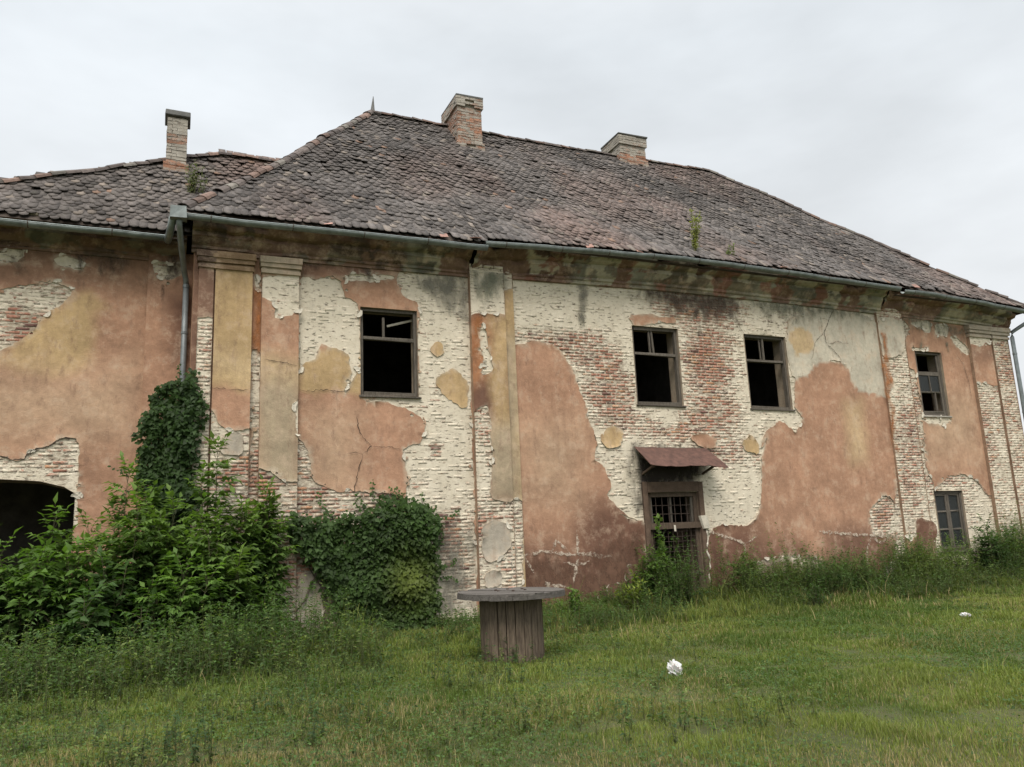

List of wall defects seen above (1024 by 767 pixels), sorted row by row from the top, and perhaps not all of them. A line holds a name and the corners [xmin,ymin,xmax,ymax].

spalling [0,253,86,351]
spalling [151,260,182,285]
leakage [417,272,506,316]
leakage [579,285,587,322]
leakage [647,290,734,320]
spalling [0,437,83,527]
crack [352,419,396,493]
spalling [190,264,825,639]
spalling [846,304,1024,577]
leakage [527,532,646,609]